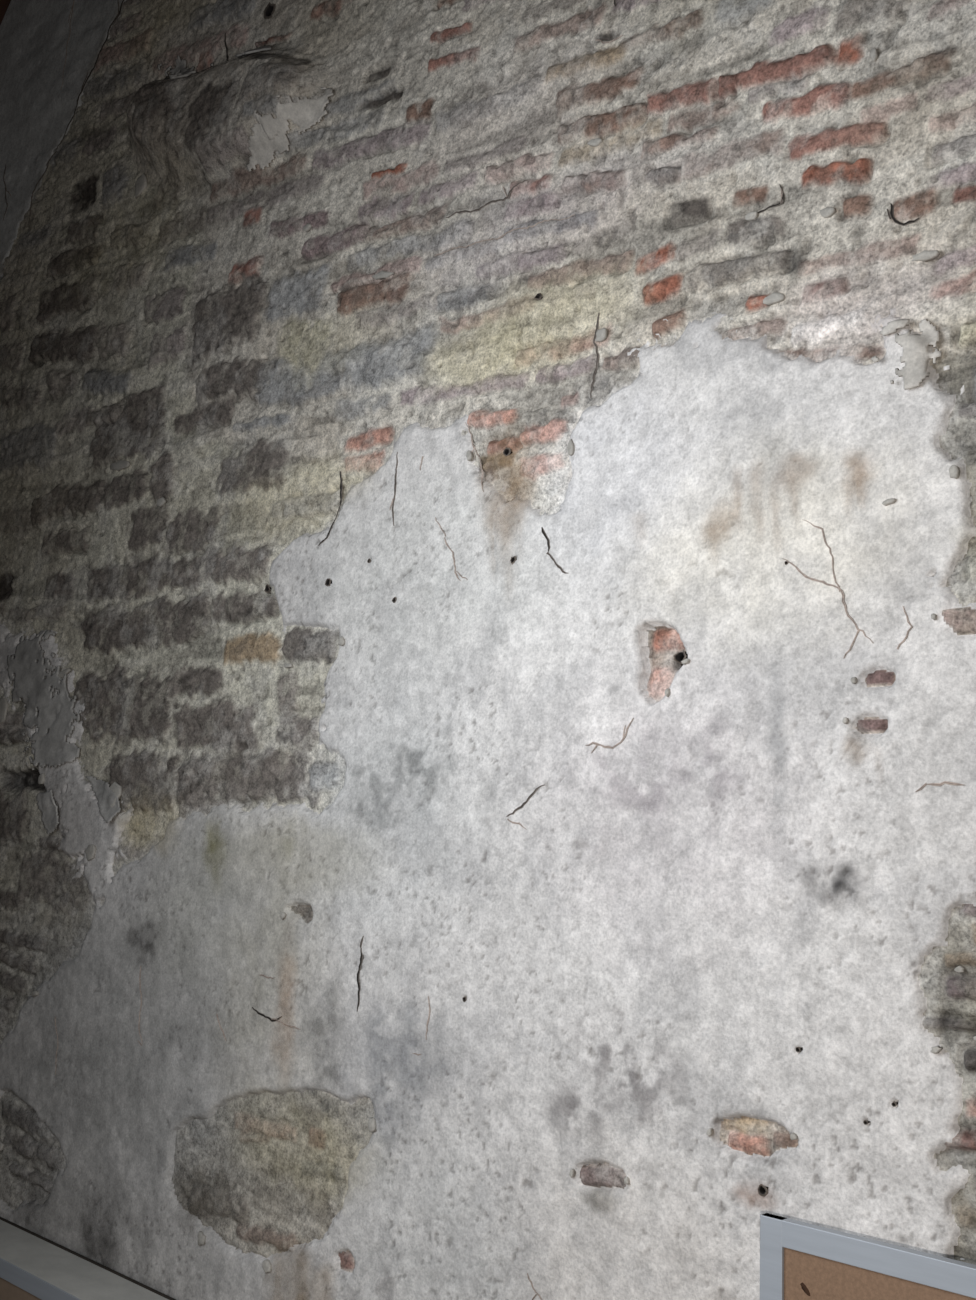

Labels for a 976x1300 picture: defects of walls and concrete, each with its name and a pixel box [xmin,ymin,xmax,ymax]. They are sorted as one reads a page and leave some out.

flaking render [129,0,976,527]
flaking render [0,0,369,1044]
crack [782,519,913,658]
flaking render [931,537,976,635]
flaking render [643,626,691,702]
flaking render [842,717,888,734]
flaking render [851,669,896,687]
flaking render [0,1091,66,1210]
flaking render [172,1090,377,1273]
flaking render [569,1162,630,1189]
flaking render [706,1116,798,1157]
flaking render [918,904,976,1265]